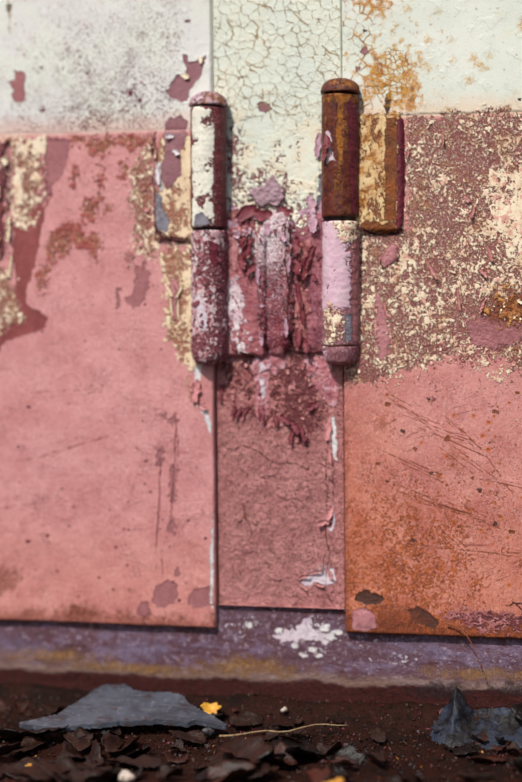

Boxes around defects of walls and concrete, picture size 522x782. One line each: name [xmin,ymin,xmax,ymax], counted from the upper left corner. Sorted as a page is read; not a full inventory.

corrosion [352,0,393,16]
peeling [8,70,26,107]
peeling [166,54,206,102]
crack [213,0,412,132]
peeling [0,98,522,464]
corrosion [475,281,522,354]
peeling [295,555,337,591]
corrosion [346,592,522,639]
peeling [408,605,522,637]